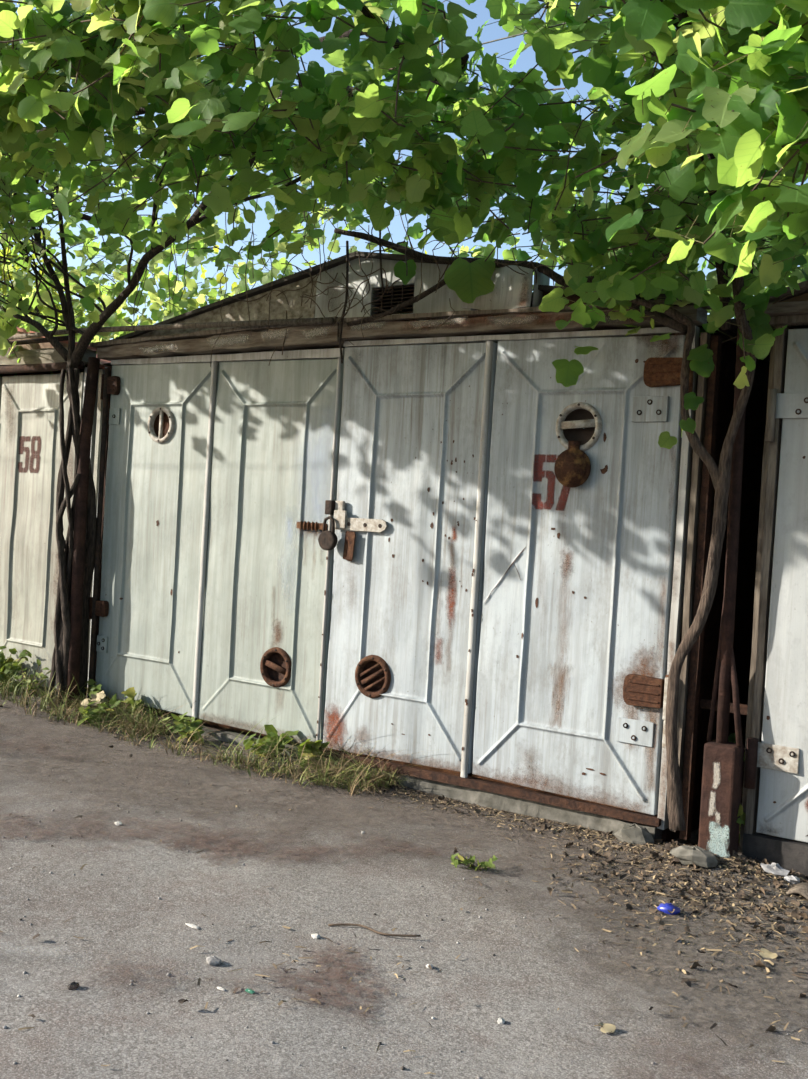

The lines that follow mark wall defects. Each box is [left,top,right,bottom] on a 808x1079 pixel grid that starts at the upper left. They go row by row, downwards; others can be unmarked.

rust [447,528,456,623]
rust [325,710,461,774]
peeling [708,763,729,858]